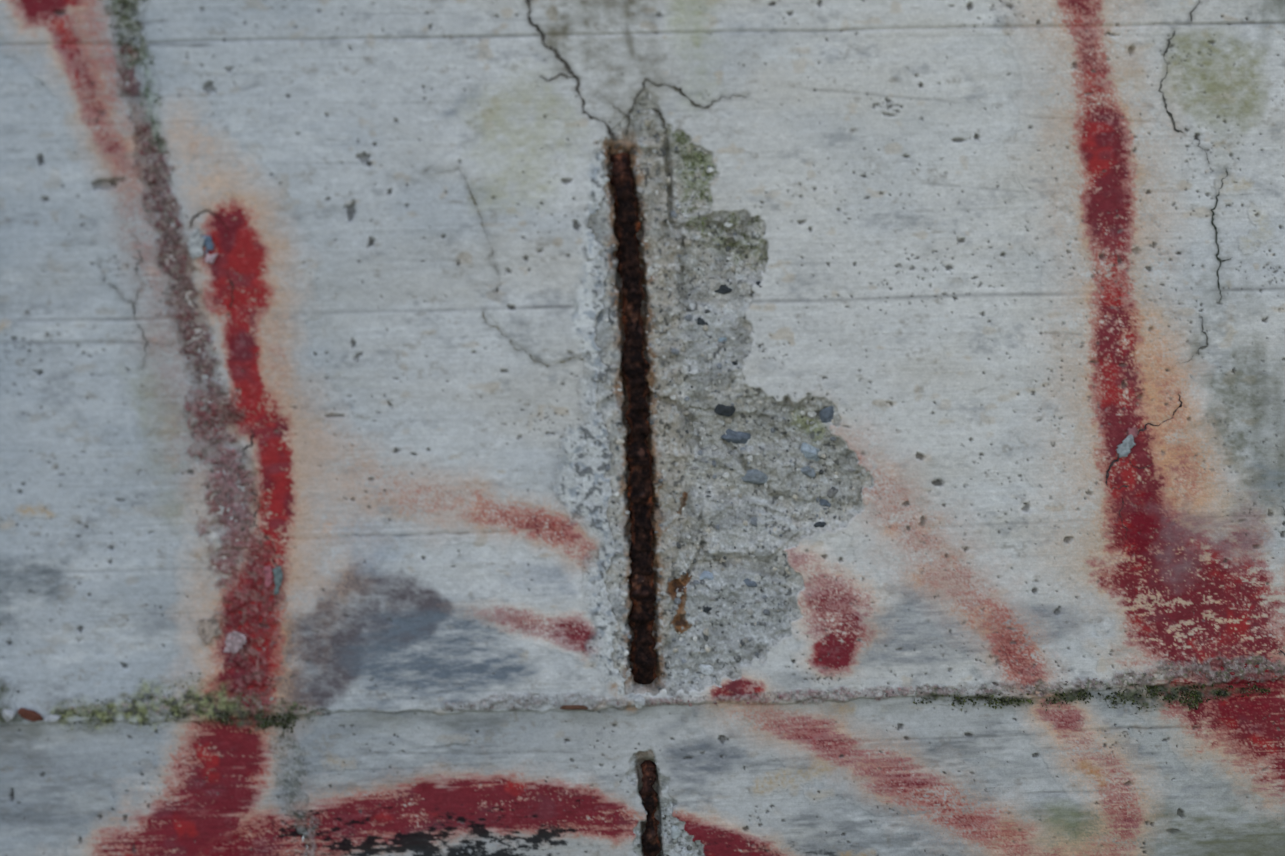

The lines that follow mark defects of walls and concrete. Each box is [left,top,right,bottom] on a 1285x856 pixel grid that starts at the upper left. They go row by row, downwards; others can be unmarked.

crack [526,0,746,141]
spalling [441,92,1285,712]
crack [1105,0,1230,539]
spalling [625,750,703,856]